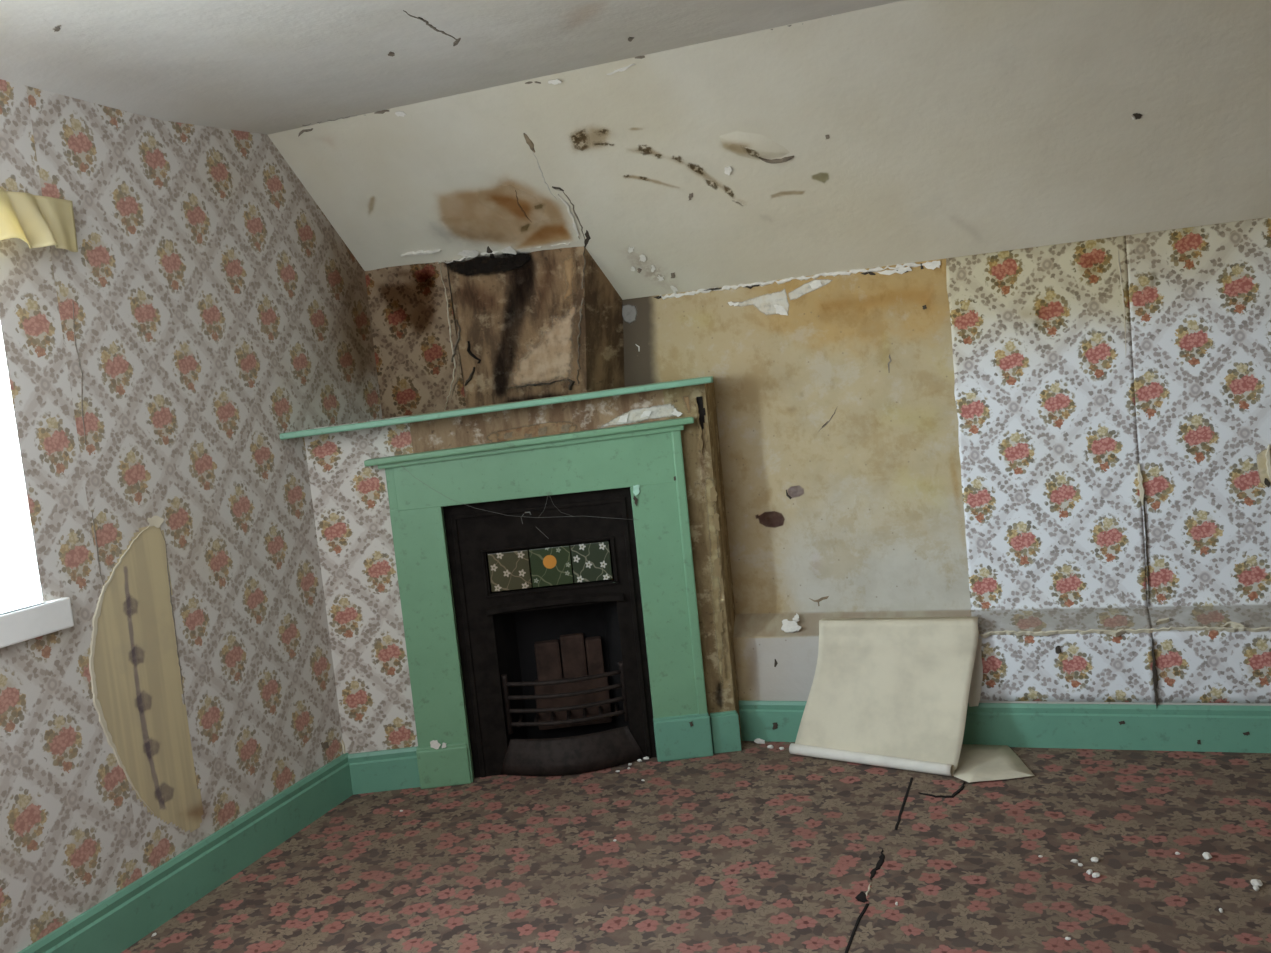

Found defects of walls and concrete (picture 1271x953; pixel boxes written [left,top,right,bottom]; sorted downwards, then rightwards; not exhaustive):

crack [403,10,461,46]
peeling [628,246,941,315]
peeling [89,526,204,833]